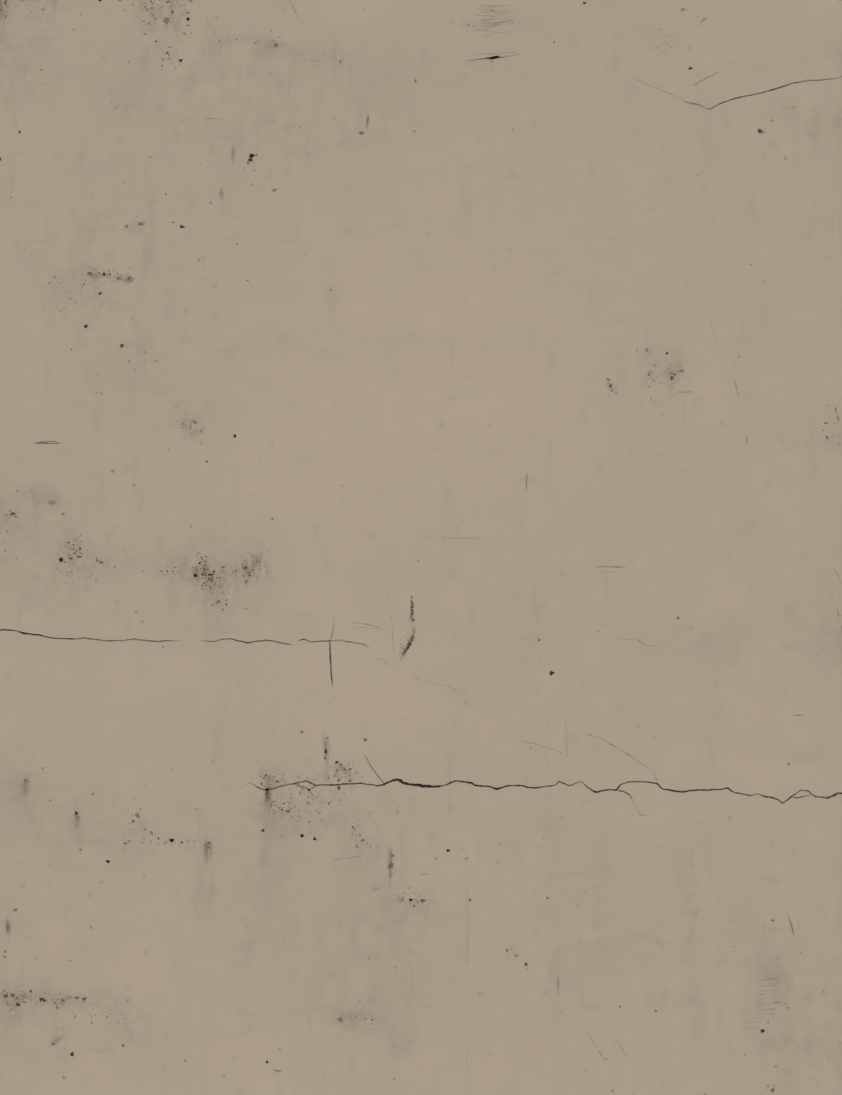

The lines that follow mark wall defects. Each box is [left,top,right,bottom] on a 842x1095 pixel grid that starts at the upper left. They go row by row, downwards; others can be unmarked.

crack [713,80,819,108]
crack [0,629,170,642]
crack [210,638,361,681]
crack [253,766,842,803]